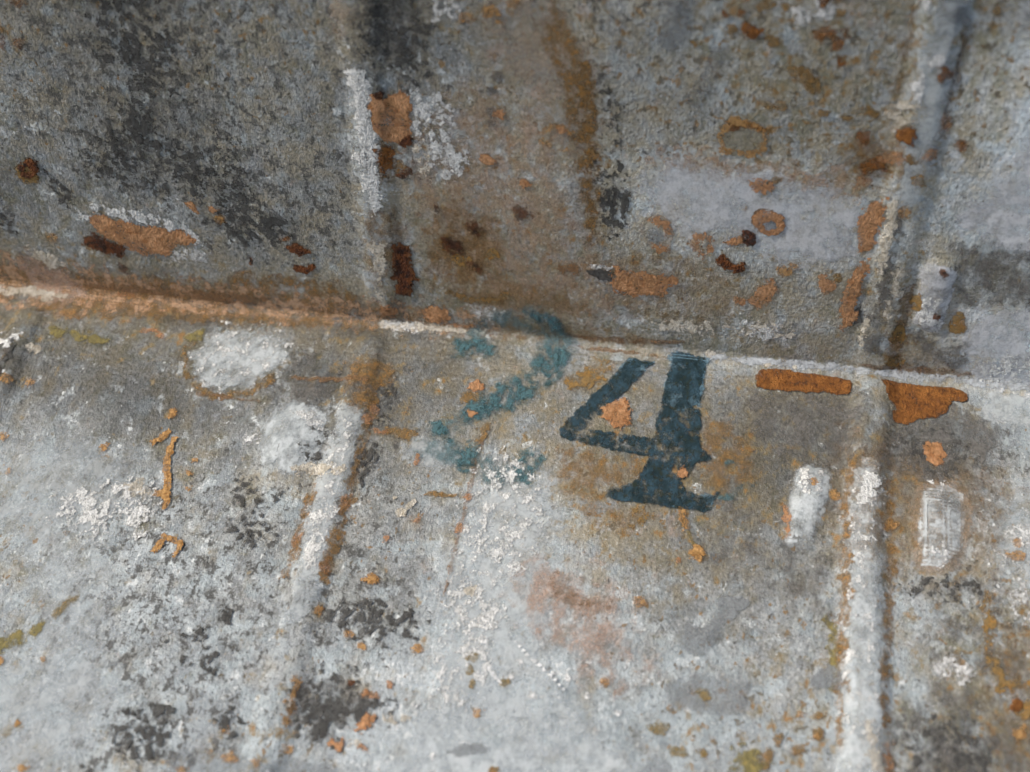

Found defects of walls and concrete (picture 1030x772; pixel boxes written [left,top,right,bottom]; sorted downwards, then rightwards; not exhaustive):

rust [813,0,852,67]
rust [15,158,40,184]
rust [367,90,416,180]
rust [701,116,845,195]
rust [834,125,937,197]
rust [0,212,525,344]
rust [687,208,785,274]
rust [817,197,911,332]
leakage [181,320,315,400]
rust [564,335,682,390]
rust [748,368,867,460]
rust [864,325,1010,483]